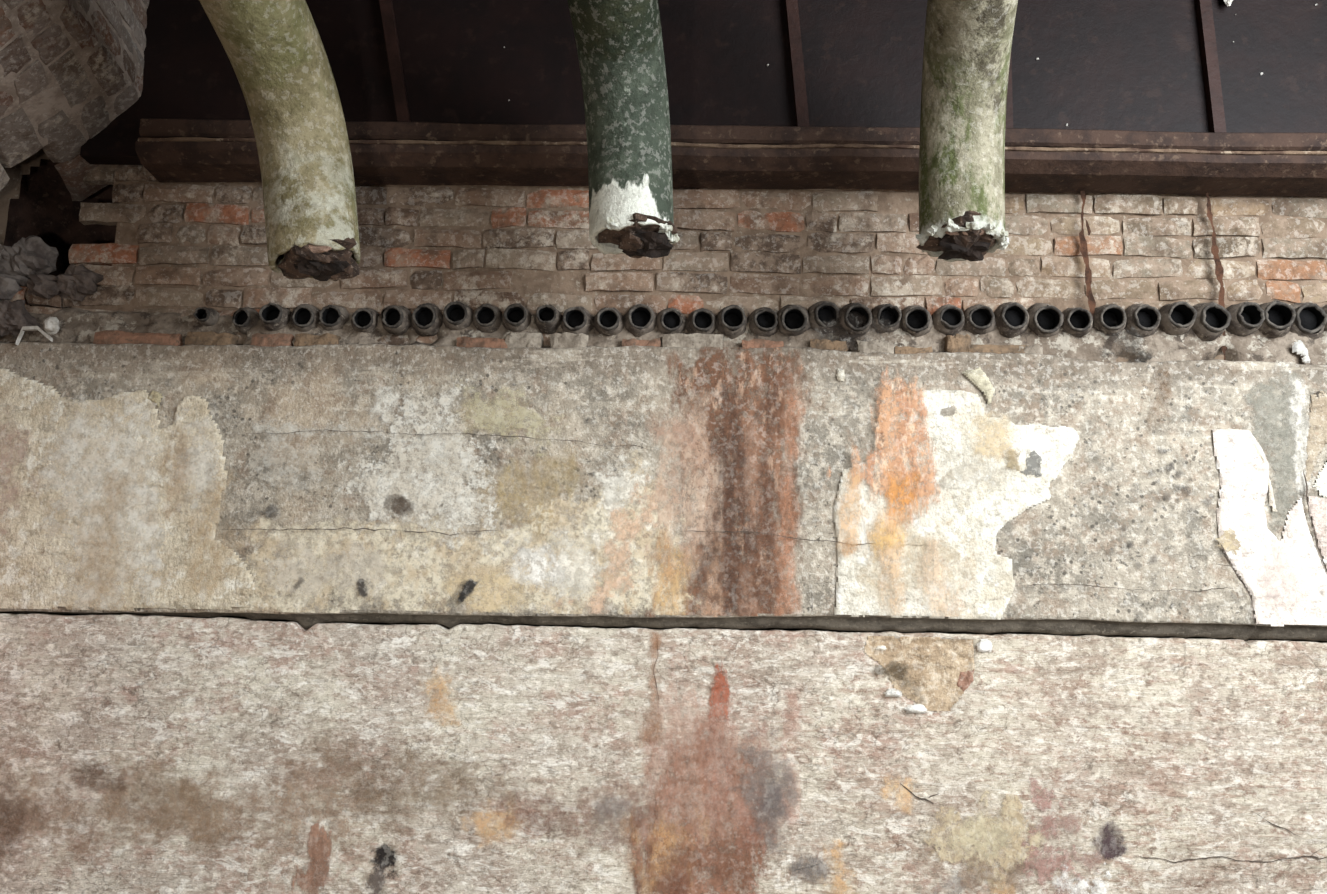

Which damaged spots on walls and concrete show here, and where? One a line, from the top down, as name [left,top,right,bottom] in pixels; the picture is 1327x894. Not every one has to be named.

spalling [4,159,117,276]
corrosion [646,347,806,617]
corrosion [841,368,941,609]
peeling [810,334,1079,620]
peeling [1211,391,1327,626]
crack [1303,470,1327,572]
corrosion [630,664,777,894]
spalling [864,636,992,713]